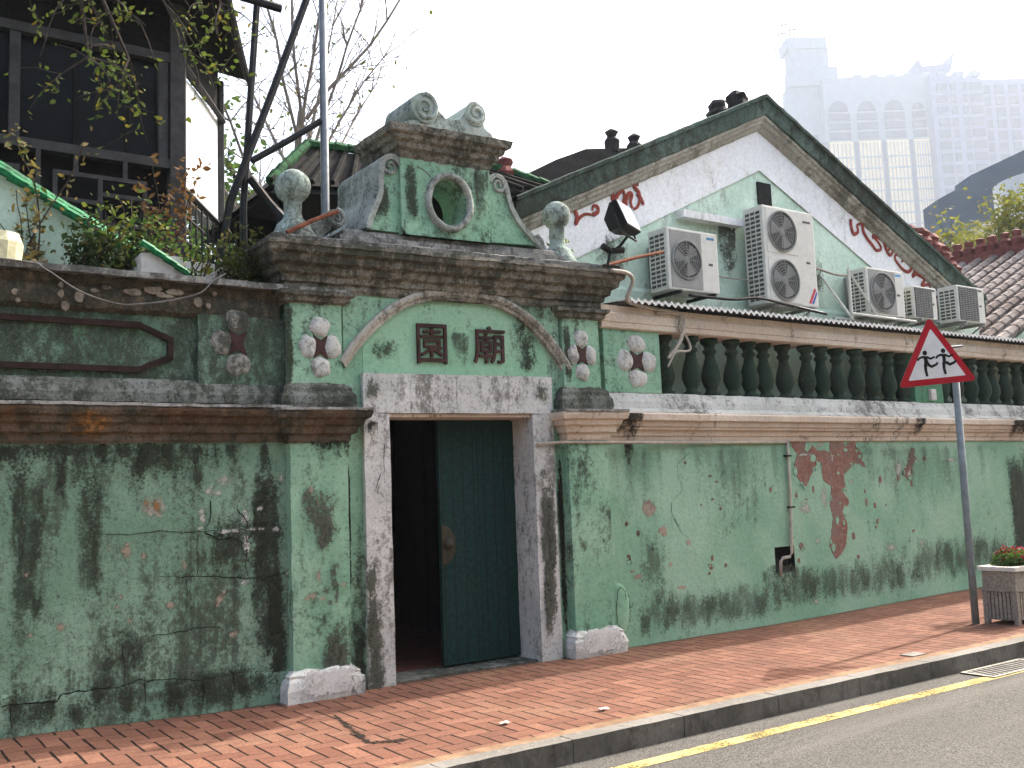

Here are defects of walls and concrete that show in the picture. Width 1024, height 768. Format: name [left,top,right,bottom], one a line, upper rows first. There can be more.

damp [0,443,288,713]
crack [89,501,288,636]
damp [302,441,386,689]
damp [540,460,568,635]
damp [618,413,644,463]
peeling [642,498,667,537]
damp [642,536,1006,632]
peeling [790,441,866,559]
peeling [897,445,926,487]
damp [6,628,153,730]
crack [1,644,242,735]